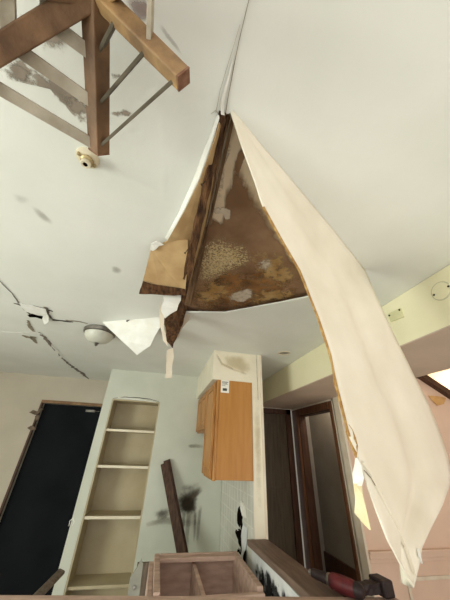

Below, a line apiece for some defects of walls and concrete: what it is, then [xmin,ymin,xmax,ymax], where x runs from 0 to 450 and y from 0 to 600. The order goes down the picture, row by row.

water stain [7,60,86,122]
crack [211,0,249,115]
water stain [139,150,308,312]
crack [0,281,89,379]
water stain [178,490,199,512]
spalling [235,500,248,562]
peeling [346,425,371,530]
peeling [255,565,286,597]